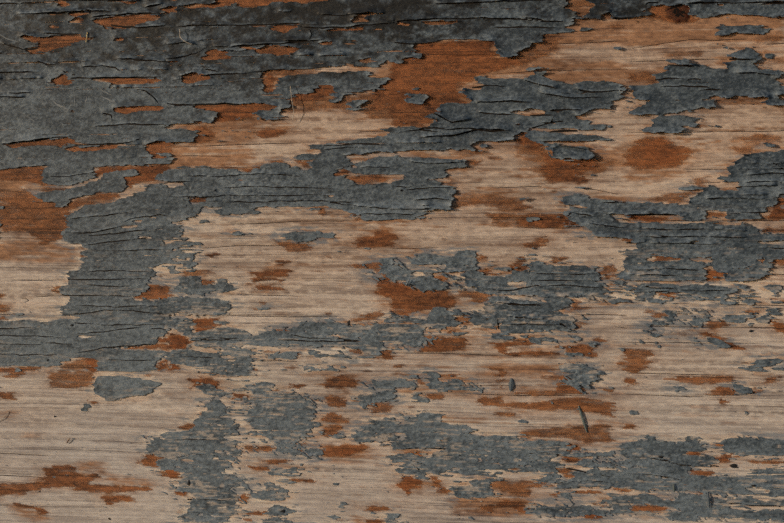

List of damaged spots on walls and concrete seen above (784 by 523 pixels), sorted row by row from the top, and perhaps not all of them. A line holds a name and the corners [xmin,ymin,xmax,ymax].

crack [0,0,784,106]
crack [3,113,164,147]
peeling [0,0,784,208]
crack [324,70,619,150]
crack [167,143,452,221]
peeling [0,46,784,401]
crack [571,162,784,245]
crack [0,270,171,361]
crack [228,315,358,342]
crack [488,268,784,344]
peeling [141,380,345,523]
peeling [351,411,784,523]